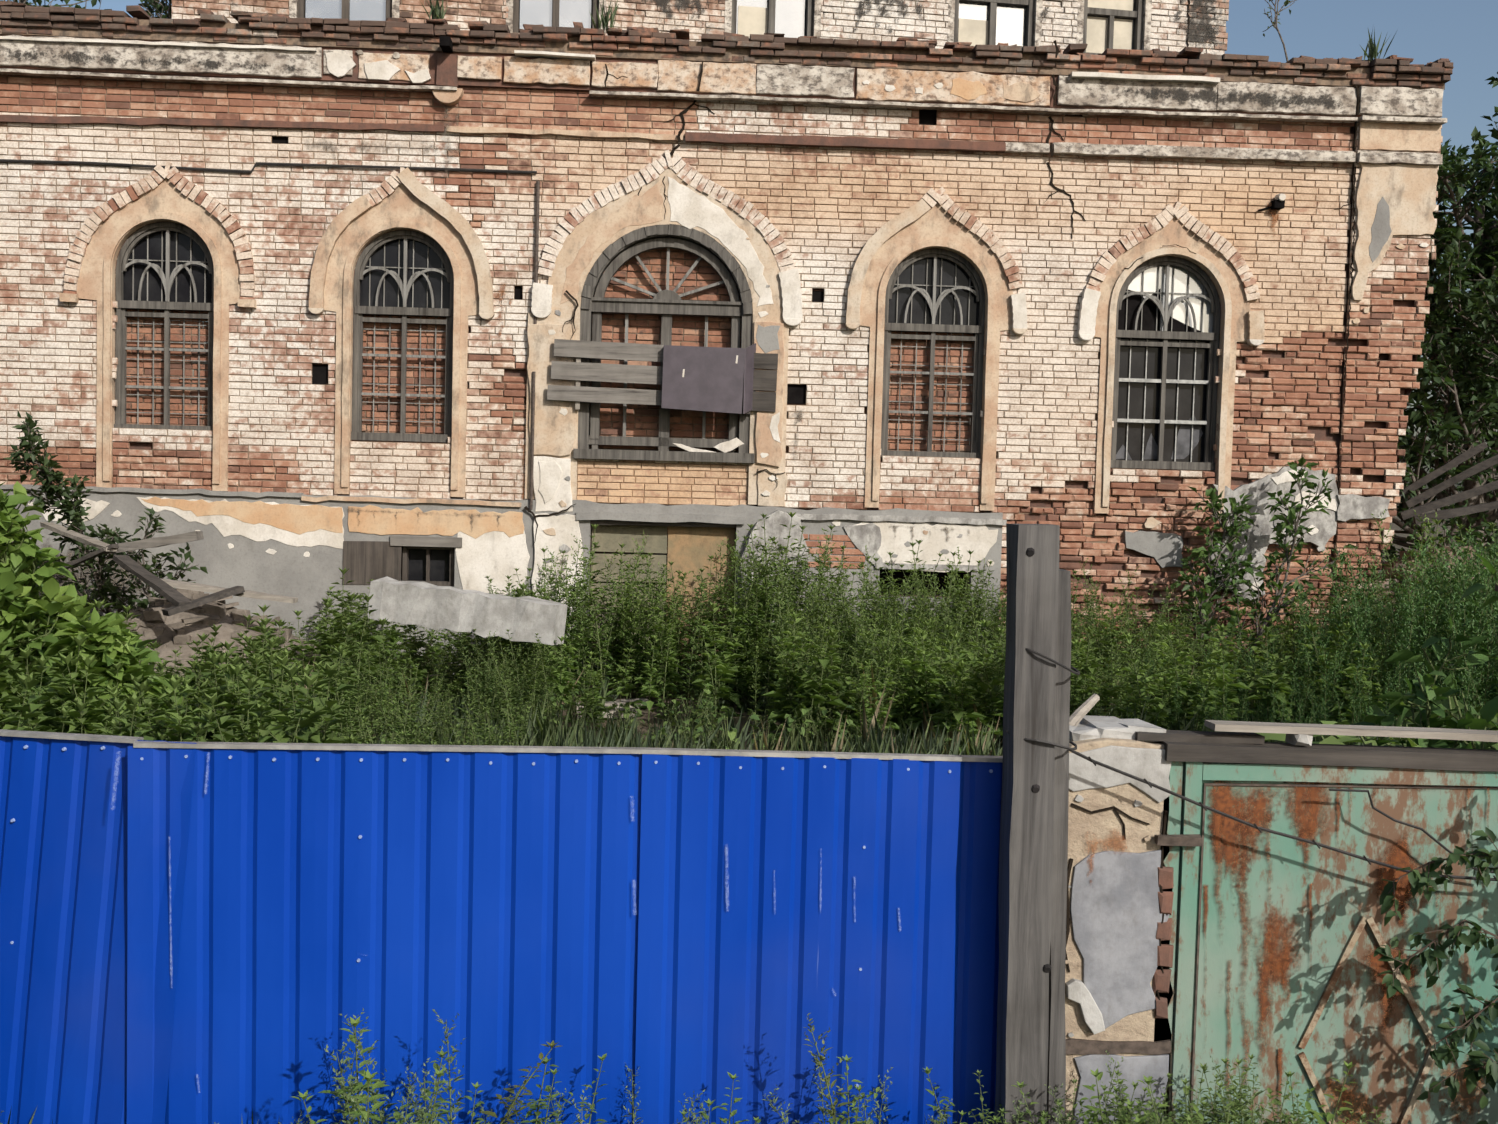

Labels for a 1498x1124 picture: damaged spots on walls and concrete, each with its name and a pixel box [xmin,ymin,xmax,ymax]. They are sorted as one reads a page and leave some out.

water stain [632,0,718,29]
water stain [853,0,923,35]
water stain [1174,0,1222,51]
crack [638,62,715,219]
crack [1044,40,1086,239]
spalling [1213,163,1438,490]
peeling [0,447,571,595]
flaking render [1069,745,1172,807]
flaking render [1065,835,1174,1038]
rust [1204,780,1352,1123]
rust [1365,837,1438,1033]
rust [1323,1079,1370,1124]